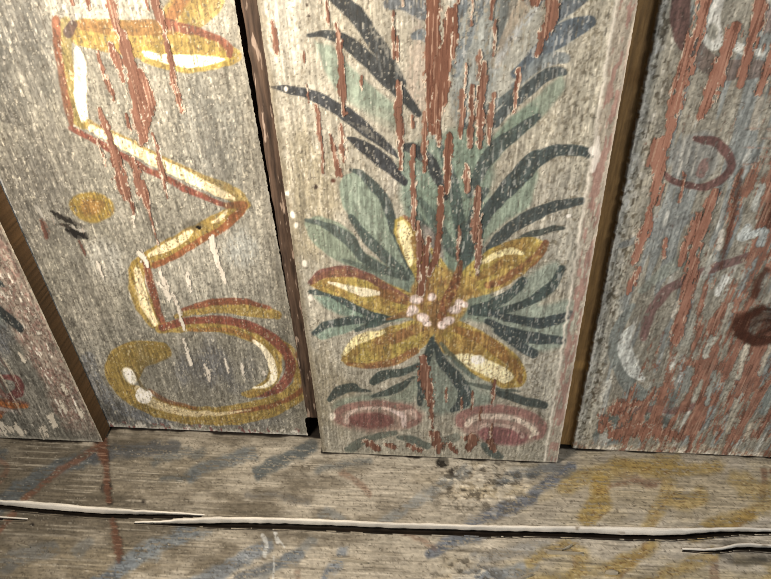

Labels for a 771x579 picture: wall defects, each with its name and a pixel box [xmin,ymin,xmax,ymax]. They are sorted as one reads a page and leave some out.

peeling [96,107,159,245]
peeling [96,0,168,199]
peeling [144,0,186,114]
peeling [270,20,279,57]
peeling [306,0,348,178]
peeling [393,0,497,297]
peeling [626,0,712,295]
peeling [696,0,771,122]
peeling [157,269,193,366]
peeling [208,234,226,284]
peeling [597,129,771,457]
crack [0,500,771,554]